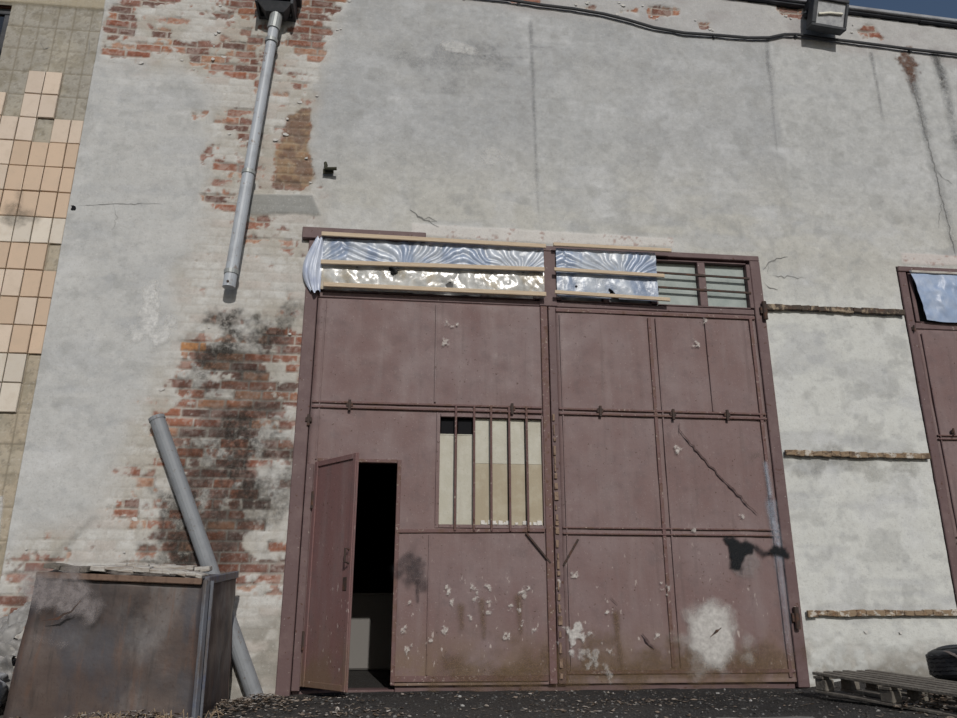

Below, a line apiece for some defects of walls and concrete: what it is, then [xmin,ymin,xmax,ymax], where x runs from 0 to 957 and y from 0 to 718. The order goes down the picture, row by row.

spalling [575,1,597,11]
spalling [615,2,714,31]
flaking render [0,0,351,191]
spalling [112,442,200,572]
spalling [131,283,302,615]
peeling [563,622,590,654]